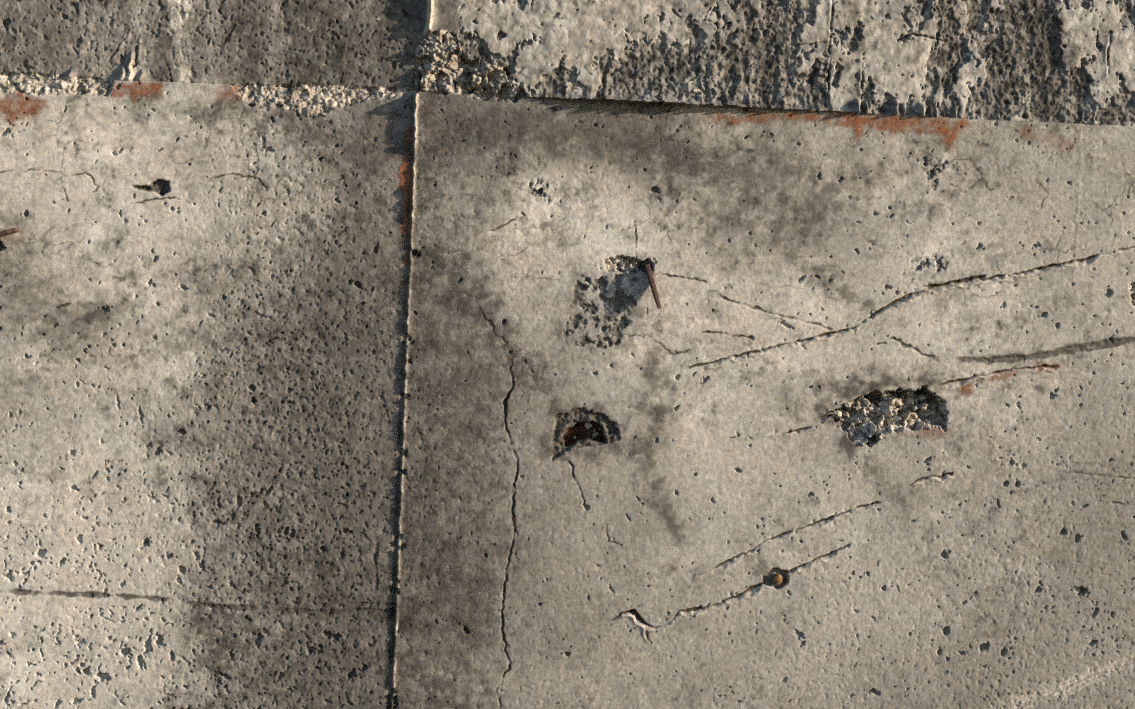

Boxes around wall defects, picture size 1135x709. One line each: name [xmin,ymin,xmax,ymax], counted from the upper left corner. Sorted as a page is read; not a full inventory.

corrosion [0,92,45,125]
corrosion [112,82,162,102]
corrosion [718,111,966,147]
corrosion [399,128,413,234]
crack [630,247,1135,368]
crack [481,311,515,433]
crack [942,364,1059,389]
spalling [827,386,946,446]
crack [913,472,953,486]
crack [499,463,519,704]
crack [613,501,880,640]